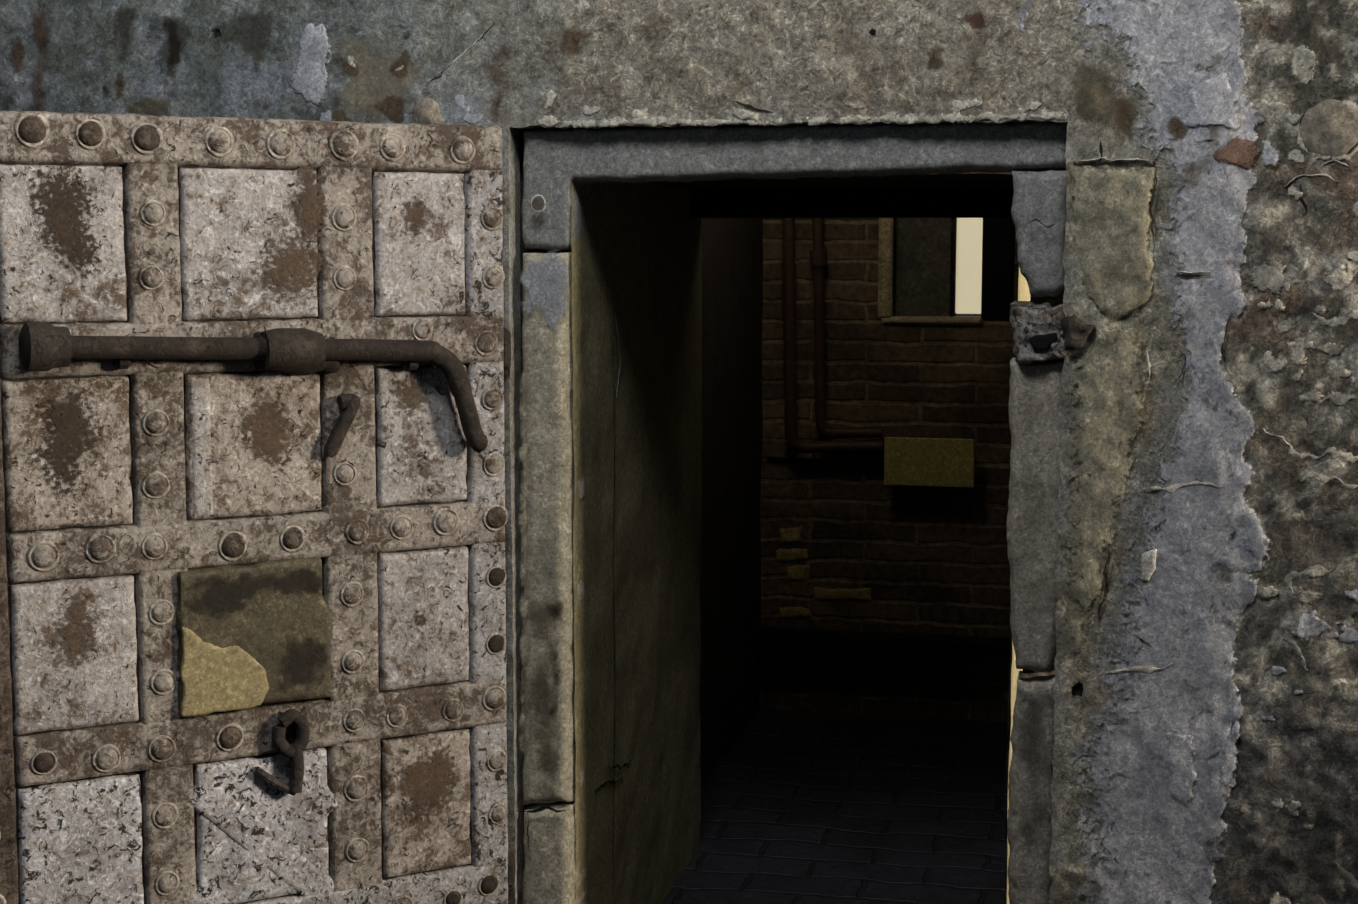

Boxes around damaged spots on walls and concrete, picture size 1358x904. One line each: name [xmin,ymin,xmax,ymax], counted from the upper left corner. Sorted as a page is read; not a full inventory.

peeling [289,23,331,121]
rust [14,162,107,287]
rust [242,166,336,309]
rust [392,188,433,255]
rust [24,375,120,505]
rust [232,388,294,482]
rust [384,369,437,428]
peeling [1060,0,1358,904]
rust [42,592,109,675]
rust [391,736,460,830]